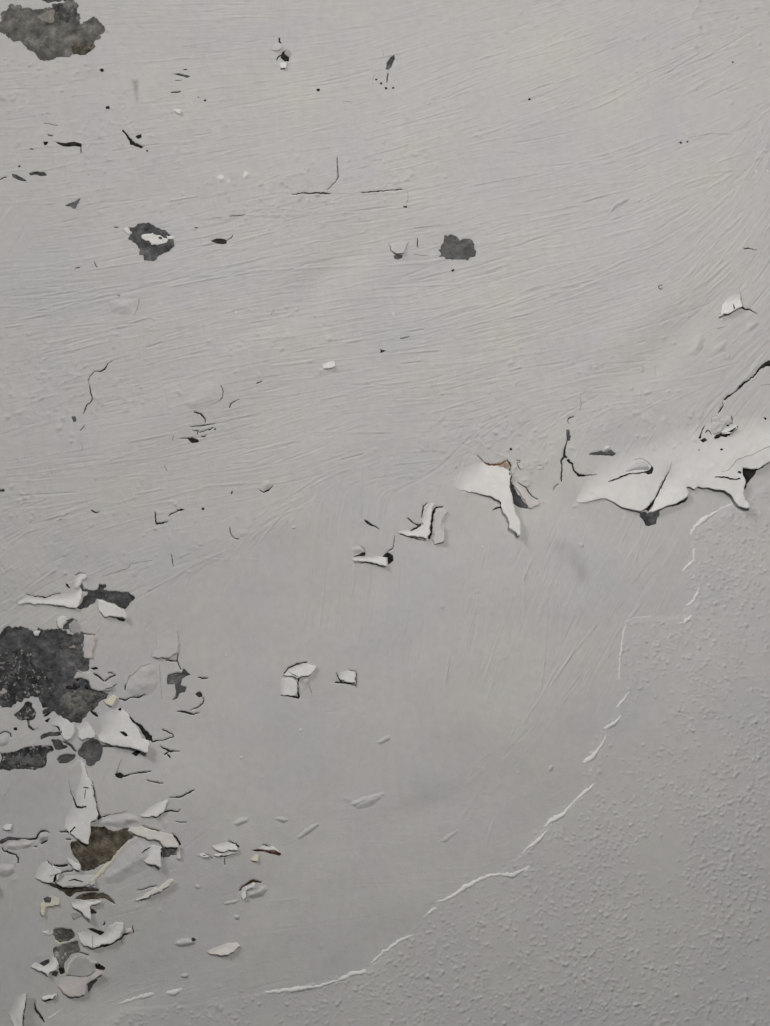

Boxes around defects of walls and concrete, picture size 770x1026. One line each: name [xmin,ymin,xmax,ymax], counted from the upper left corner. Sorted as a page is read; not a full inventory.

spalling [0,0,105,61]
spalling [114,222,175,261]
peeling [718,289,757,329]
peeling [452,448,539,536]
peeling [576,415,770,526]
peeling [351,503,448,566]
spalling [0,573,194,1026]
peeling [251,844,281,862]
peeling [223,879,269,905]
peeling [206,942,240,956]